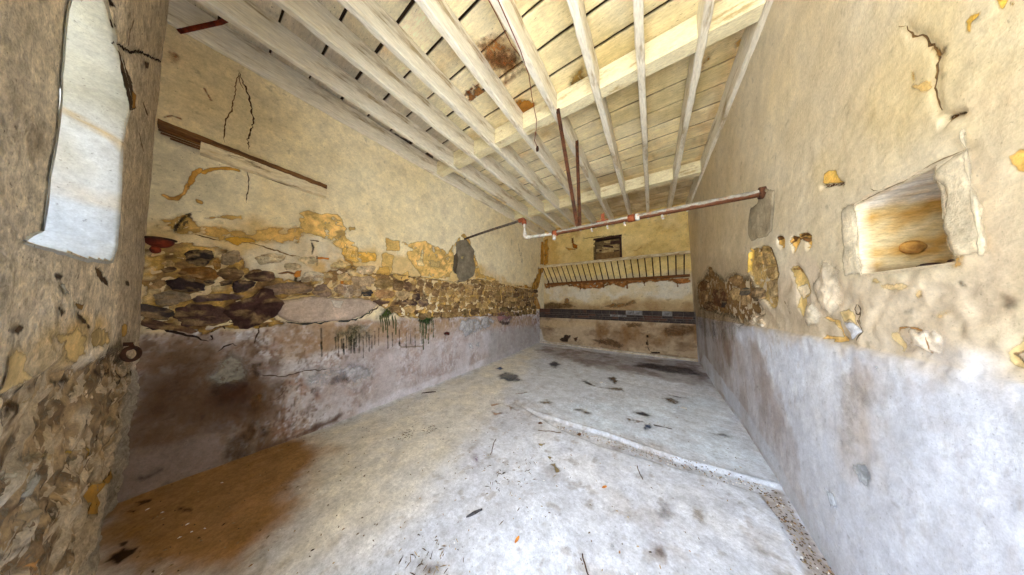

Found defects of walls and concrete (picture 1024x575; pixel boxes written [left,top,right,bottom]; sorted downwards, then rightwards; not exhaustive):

crack [111,41,161,63]
crack [898,26,943,110]
corrosion [464,84,484,101]
crack [223,71,255,200]
spalling [823,170,845,188]
spalling [141,167,812,335]
crack [286,303,388,325]
flaking render [823,309,863,342]
damp [210,356,249,404]
spalling [0,274,132,575]